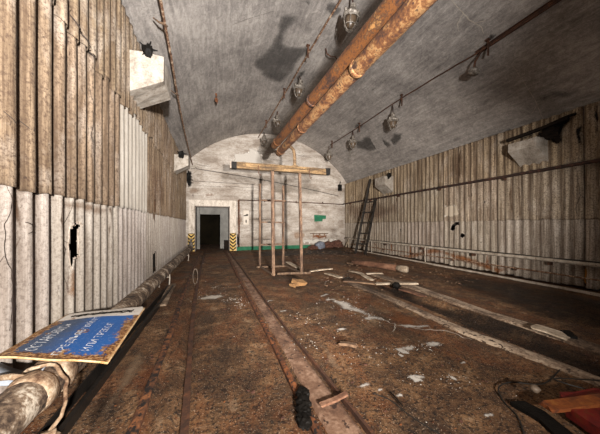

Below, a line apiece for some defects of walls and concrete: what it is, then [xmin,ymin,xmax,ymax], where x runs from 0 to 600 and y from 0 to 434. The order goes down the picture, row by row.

leakage [255,17,307,81]
spalling [67,221,83,269]